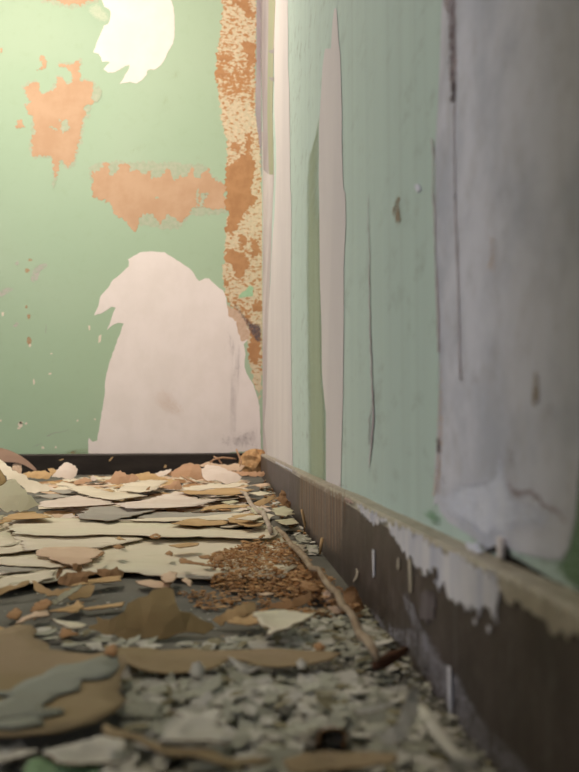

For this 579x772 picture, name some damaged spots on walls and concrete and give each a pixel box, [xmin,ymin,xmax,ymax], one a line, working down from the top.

peeling [15,55,102,188]
peeling [41,0,175,84]
peeling [88,0,293,472]
peeling [319,8,346,487]
crack [367,230,375,464]
peeling [357,0,579,641]
peeling [135,543,219,588]
peeling [272,490,322,555]
peeling [0,581,456,772]